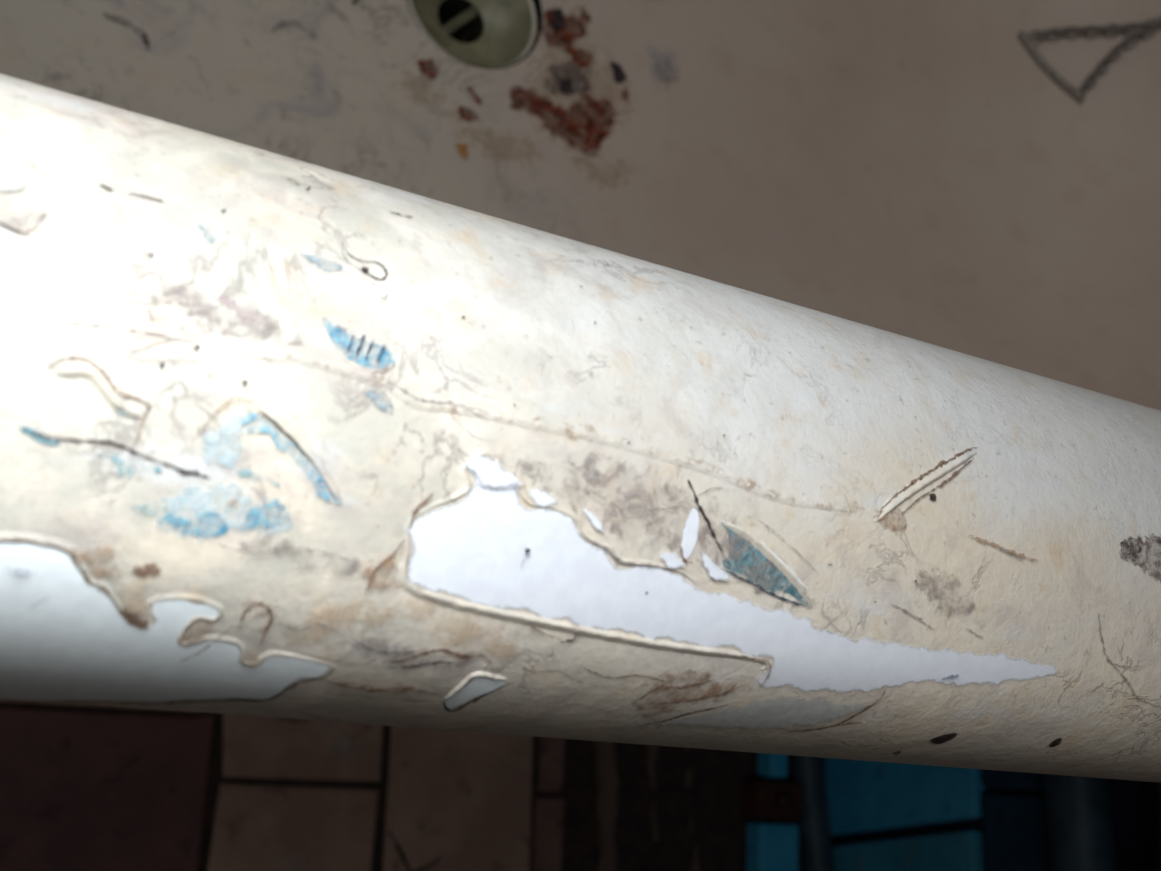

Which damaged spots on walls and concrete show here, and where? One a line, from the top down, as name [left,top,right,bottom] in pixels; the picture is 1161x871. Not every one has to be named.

crack [103,12,150,46]
corrosion [417,58,438,79]
corrosion [458,86,482,121]
corrosion [509,8,629,157]
peeling [0,531,335,702]
peeling [397,448,1058,693]